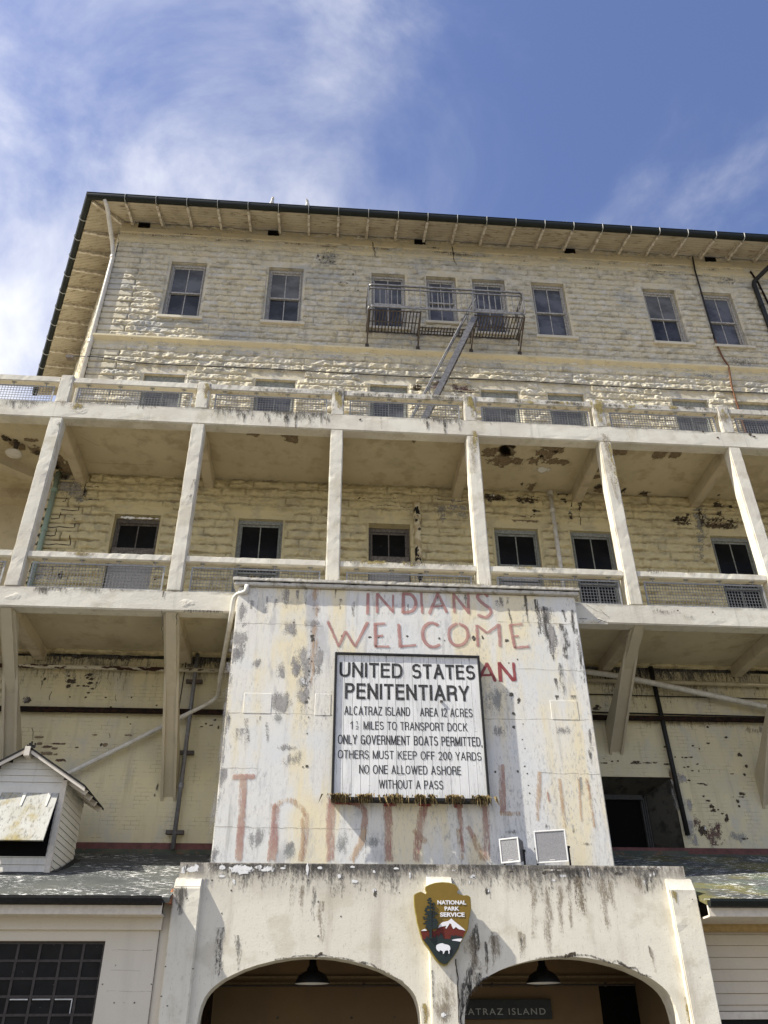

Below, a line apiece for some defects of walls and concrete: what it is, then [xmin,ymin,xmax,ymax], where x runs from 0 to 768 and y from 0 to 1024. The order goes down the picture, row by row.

spalling [1,435,41,455]
peeling [651,451,682,459]
peeling [481,445,569,523]
flaking render [671,494,742,529]
water stain [524,595,620,701]
spalling [65,673,94,698]
water stain [632,668,766,707]
water stain [180,589,319,830]
peeling [588,742,749,846]
peeling [181,849,286,891]
water stain [458,864,661,948]
water stain [538,952,652,977]